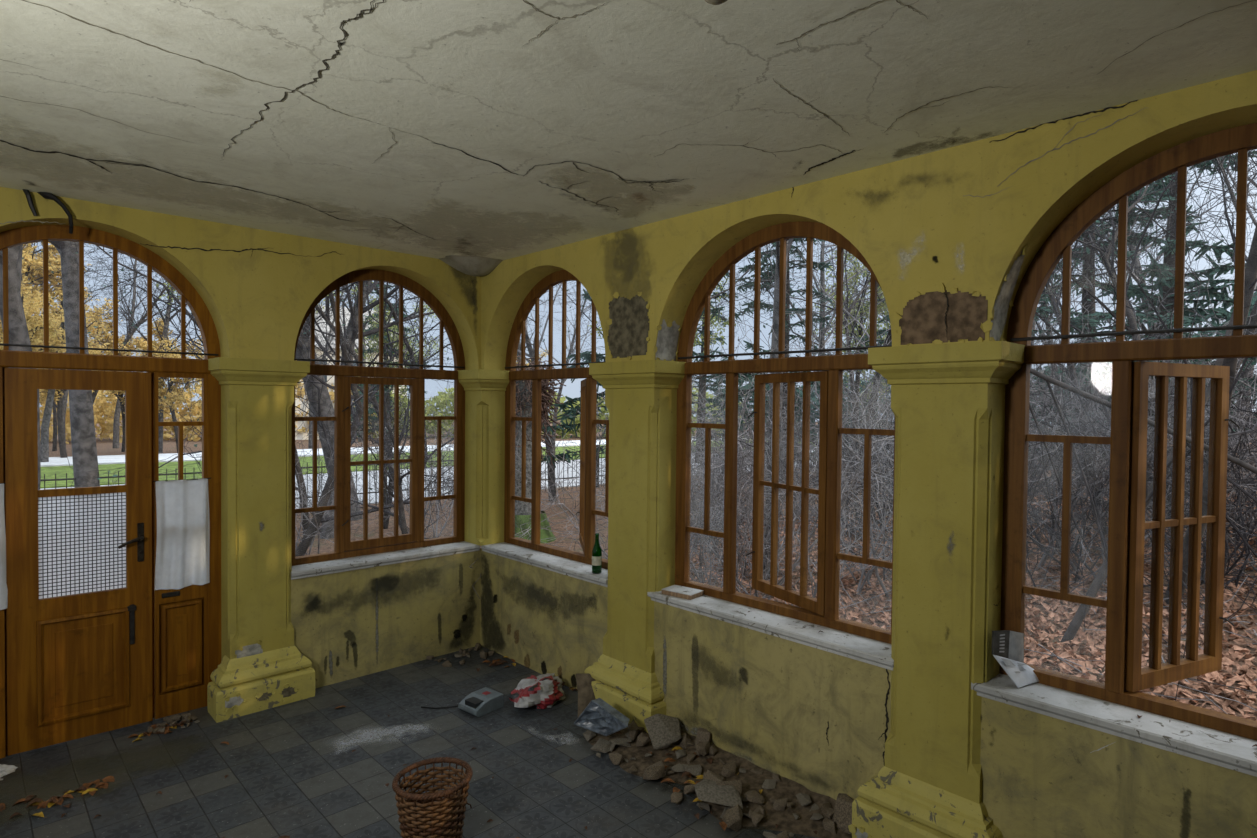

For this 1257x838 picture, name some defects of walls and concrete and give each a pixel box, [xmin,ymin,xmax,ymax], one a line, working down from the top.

crack [0,0,1008,241]
crack [140,243,344,257]
flaking render [607,291,682,361]
flaking render [893,244,1030,346]
peeling [225,683,299,713]
leakage [324,630,358,676]
leakage [306,570,436,655]
leakage [438,557,592,650]
leakage [679,638,747,736]
leakage [1180,791,1190,838]